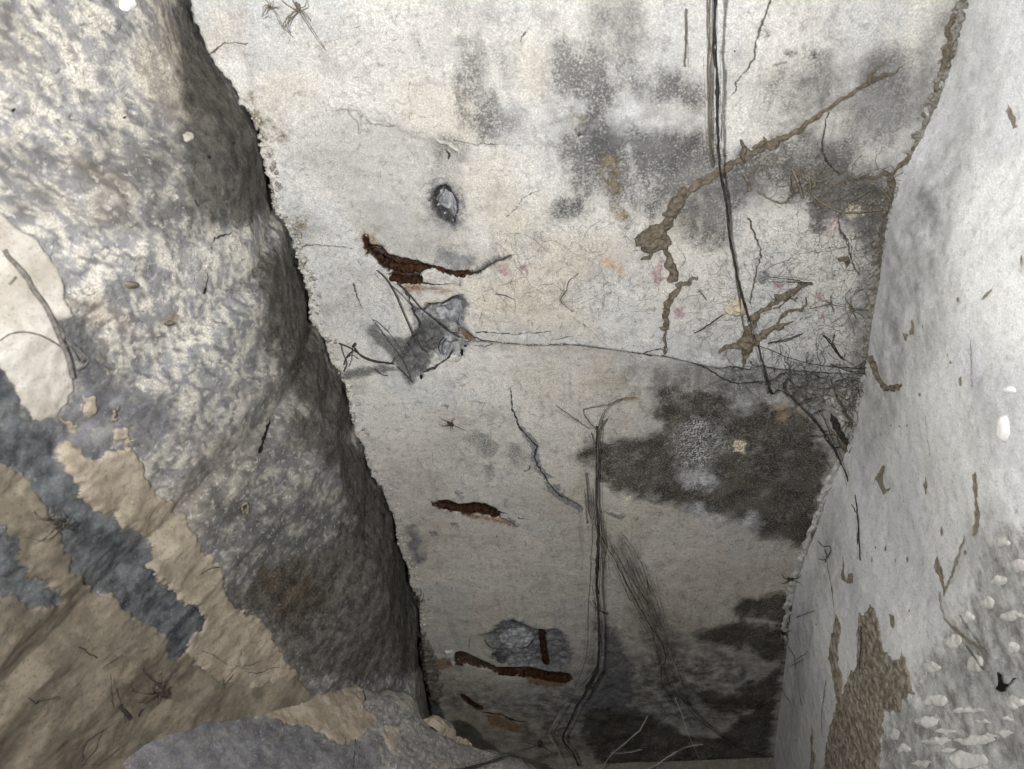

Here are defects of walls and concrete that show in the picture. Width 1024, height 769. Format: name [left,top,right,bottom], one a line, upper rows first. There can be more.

water stain [456,53,497,140]
water stain [547,41,908,249]
crack [821,111,840,175]
spalling [362,234,515,379]
crack [473,331,674,359]
crack [747,218,762,303]
crack [838,221,858,273]
crack [510,387,624,519]
water stain [578,351,828,548]
spalling [418,615,574,746]
water stain [561,593,793,764]
flaking render [810,604,915,769]